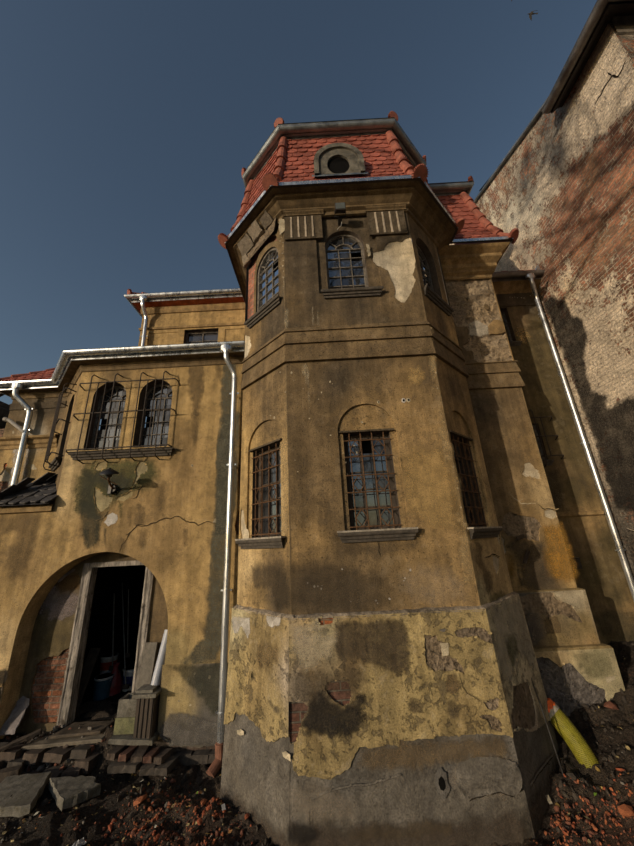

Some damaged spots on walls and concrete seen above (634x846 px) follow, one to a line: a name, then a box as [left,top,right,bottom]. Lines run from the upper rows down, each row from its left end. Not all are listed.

crack [594,60,626,105]
peeling [366,237,416,302]
peeling [437,253,513,362]
leakage [544,297,634,511]
leakage [80,502,106,547]
crack [119,515,215,552]
flaking render [501,509,557,541]
flaking render [519,592,584,623]
spalling [424,627,493,674]
flaking render [29,648,69,724]
flaking render [536,657,608,716]
flaking render [220,682,559,846]